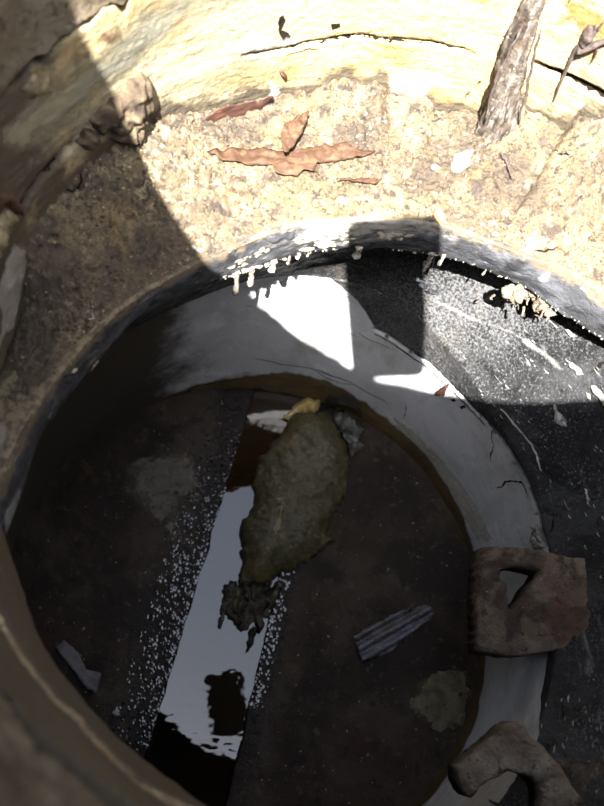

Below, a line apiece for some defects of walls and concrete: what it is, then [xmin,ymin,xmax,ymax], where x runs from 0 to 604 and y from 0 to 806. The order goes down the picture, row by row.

crack [244,33,474,57]
crack [539,62,604,98]
leakage [221,258,287,280]